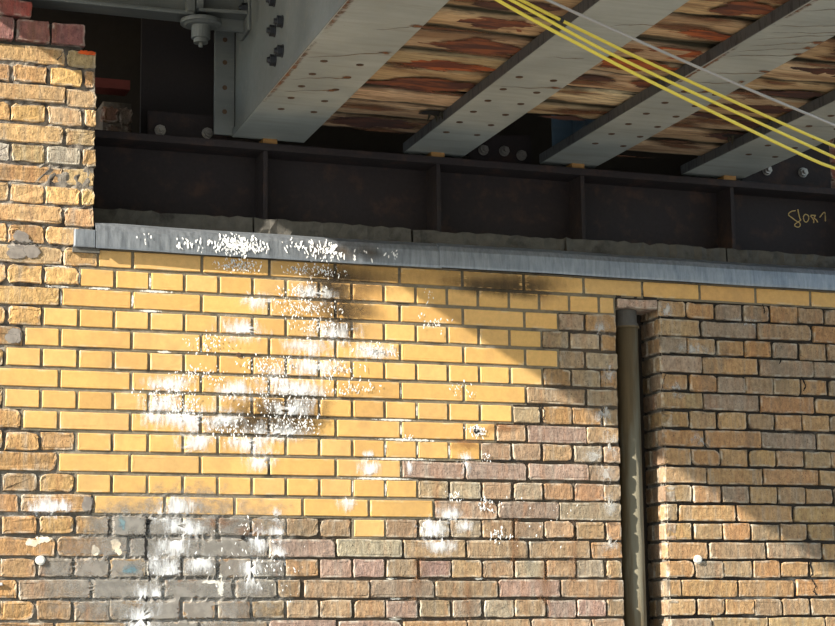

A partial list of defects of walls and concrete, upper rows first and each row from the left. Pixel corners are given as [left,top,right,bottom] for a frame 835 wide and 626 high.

water stain [131,233,399,469]
water stain [343,406,434,507]
water stain [150,497,200,576]
water stain [192,550,225,597]
water stain [229,510,296,591]
water stain [421,491,470,551]
efflorescence [131,610,150,626]